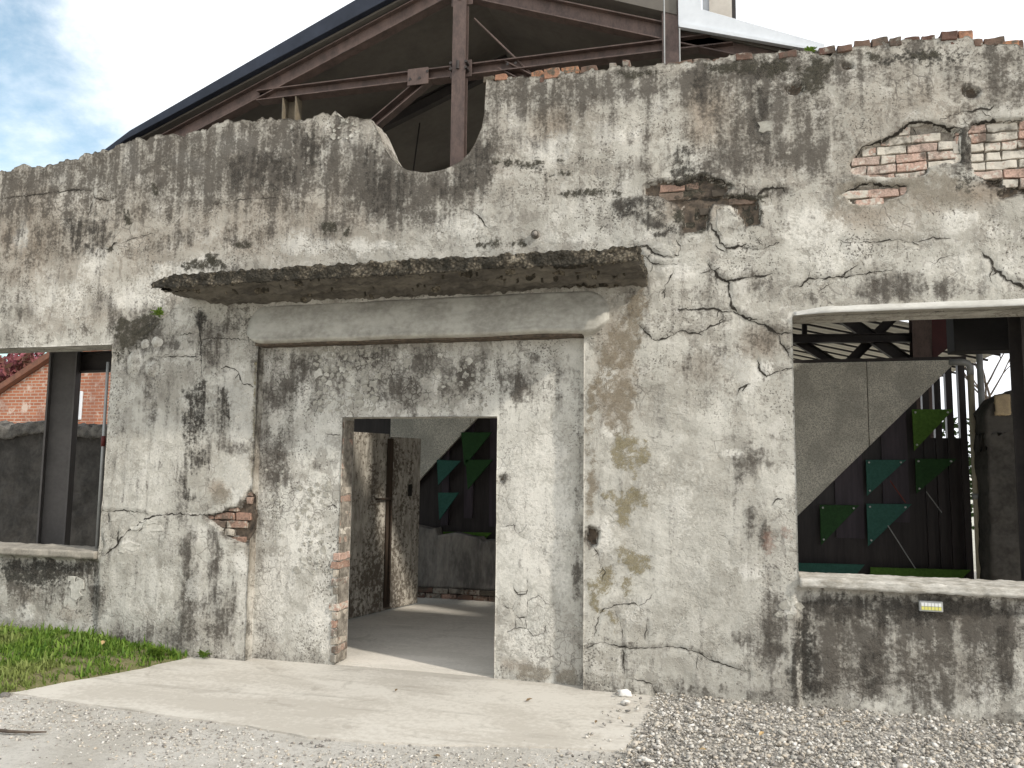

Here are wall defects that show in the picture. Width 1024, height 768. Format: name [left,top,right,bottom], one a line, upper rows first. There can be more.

damp [66,213,111,255]
damp [226,126,325,192]
damp [364,146,411,219]
spalling [646,177,761,235]
crack [638,179,949,392]
spalling [841,121,1024,206]
crack [982,252,1024,289]
crack [101,507,236,556]
spalling [208,470,284,543]
spalling [293,346,381,663]
crack [587,597,749,694]
damp [767,592,1016,704]